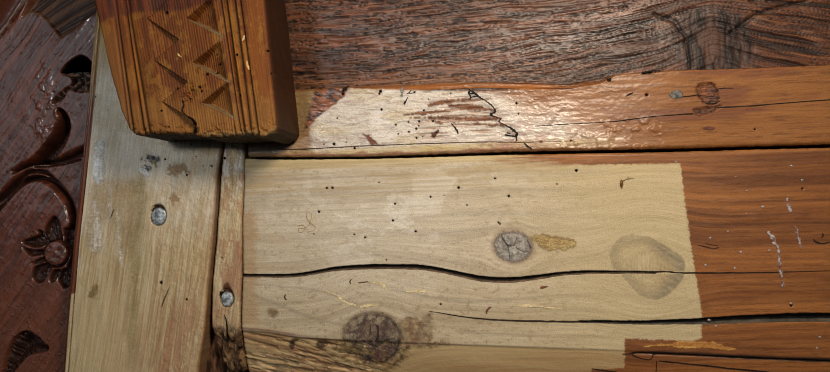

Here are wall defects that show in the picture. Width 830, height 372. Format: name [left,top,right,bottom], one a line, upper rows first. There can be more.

crack [717,99,830,108]
crack [182,100,198,133]
crack [282,89,694,150]
crack [243,264,830,283]
crack [429,311,830,325]
crack [629,352,830,372]